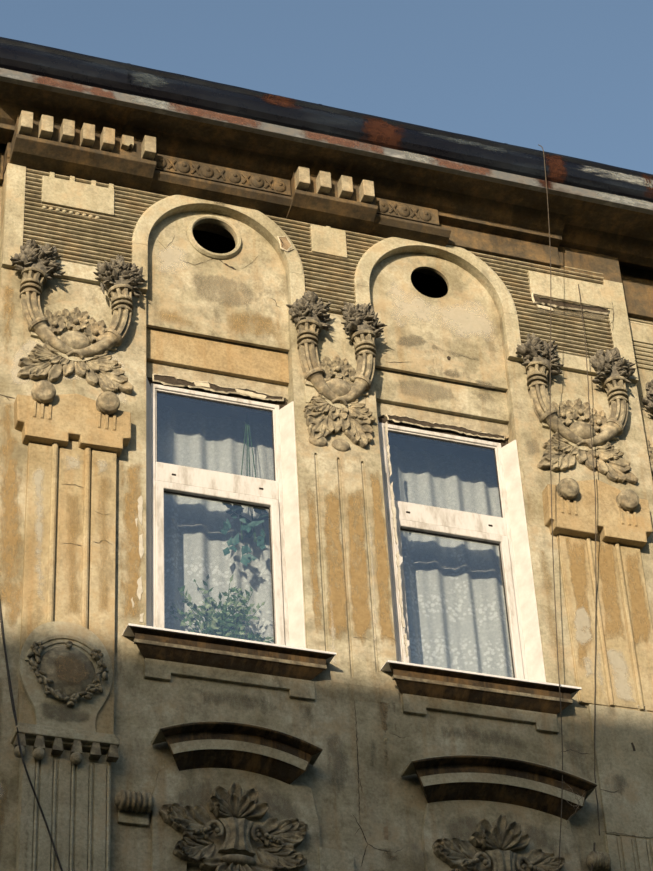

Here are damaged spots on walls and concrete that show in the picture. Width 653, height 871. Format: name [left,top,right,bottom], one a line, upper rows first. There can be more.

corrosion [264,94,293,107]
corrosion [305,118,401,154]
corrosion [537,155,567,189]
peeling [135,496,144,558]
peeling [131,576,144,622]
crack [353,701,402,866]